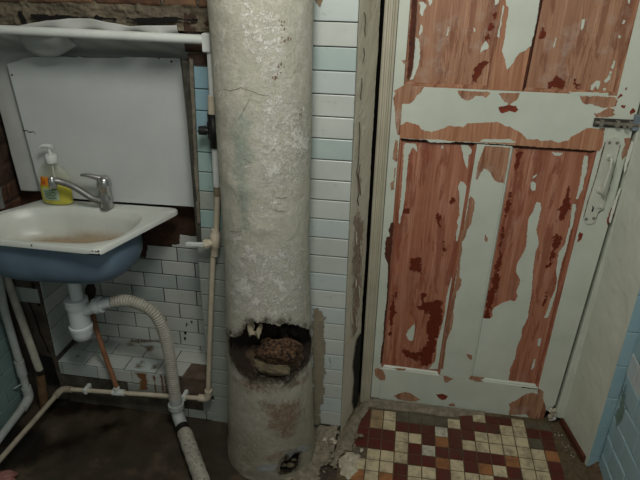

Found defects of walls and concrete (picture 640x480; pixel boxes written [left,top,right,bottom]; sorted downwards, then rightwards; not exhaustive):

peeling [569,60,635,118]
peeling [621,138,634,174]
peeling [375,0,605,383]
spalling [140,207,196,257]
spalling [226,319,312,384]
rust [136,361,168,401]
peeling [394,392,421,402]
peeling [509,388,556,421]
spalling [279,451,301,475]